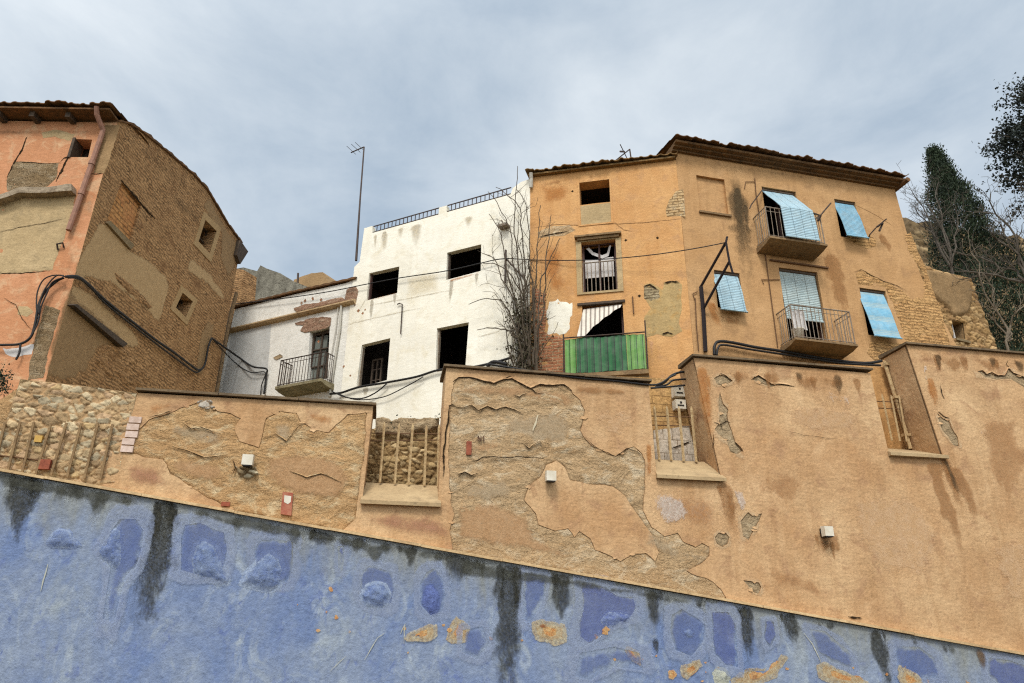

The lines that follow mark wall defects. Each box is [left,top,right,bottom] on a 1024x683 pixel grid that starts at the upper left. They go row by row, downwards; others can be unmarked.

crack [7,137,68,181]
leakage [731,189,748,244]
flaking render [293,287,366,343]
flaking render [531,287,573,372]
spalling [638,280,682,337]
spalling [974,368,1024,387]
spalling [935,414,962,448]
spalling [130,400,368,592]
spalling [385,374,789,683]
leakage [141,502,178,614]
leakage [198,512,597,683]